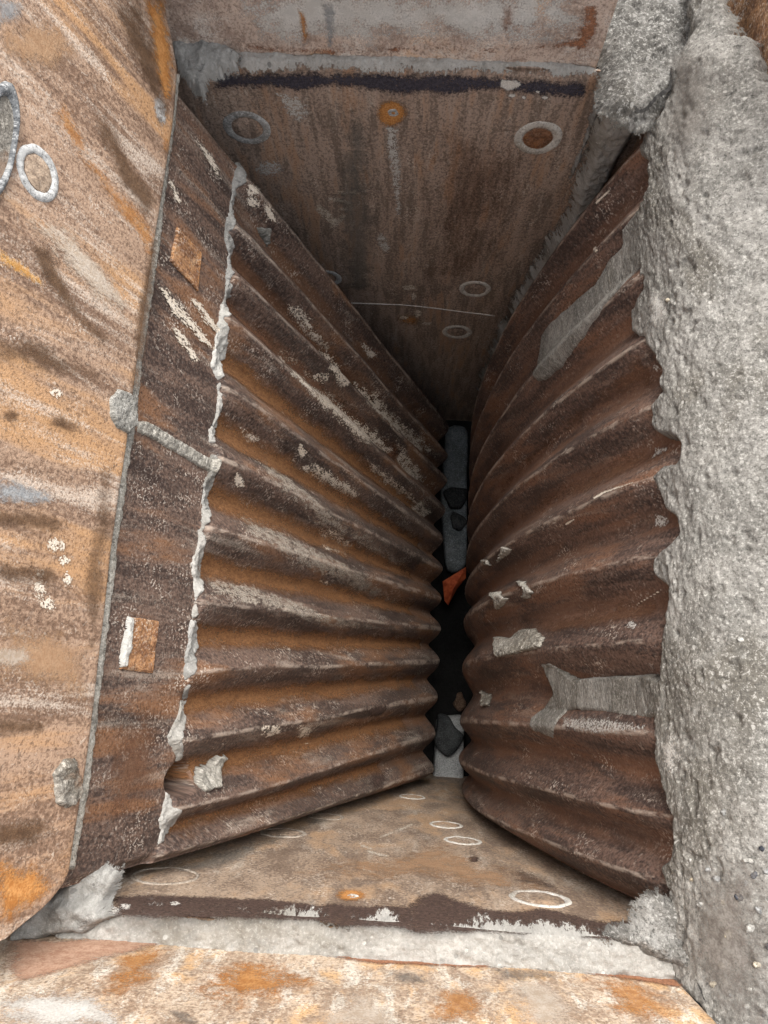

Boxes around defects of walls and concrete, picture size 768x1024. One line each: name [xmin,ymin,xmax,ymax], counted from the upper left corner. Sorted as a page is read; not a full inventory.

damp [173,0,598,121]
corrosion [226,301,401,460]
corrosion [220,353,416,509]
corrosion [215,416,423,550]
corrosion [198,552,414,616]
corrosion [197,622,421,651]
corrosion [165,713,407,779]
corrosion [9,938,158,994]
corrosion [200,962,314,1008]
damp [3,861,689,1024]
corrosion [337,956,487,968]
corrosion [587,973,681,1017]